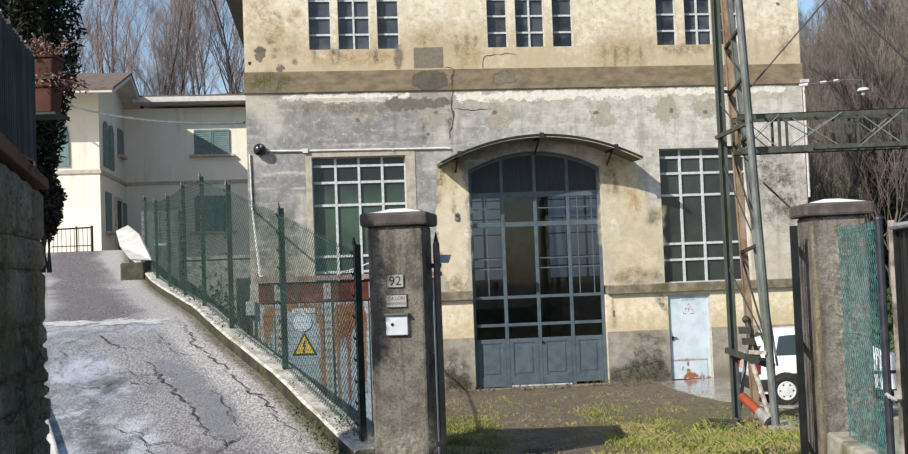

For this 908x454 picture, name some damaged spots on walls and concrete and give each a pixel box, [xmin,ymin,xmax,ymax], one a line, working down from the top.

spalling [254,41,276,62]
crack [445,67,491,139]
peeling [282,70,727,114]
peeling [742,84,786,97]
rust [261,303,275,347]
rust [287,302,369,415]